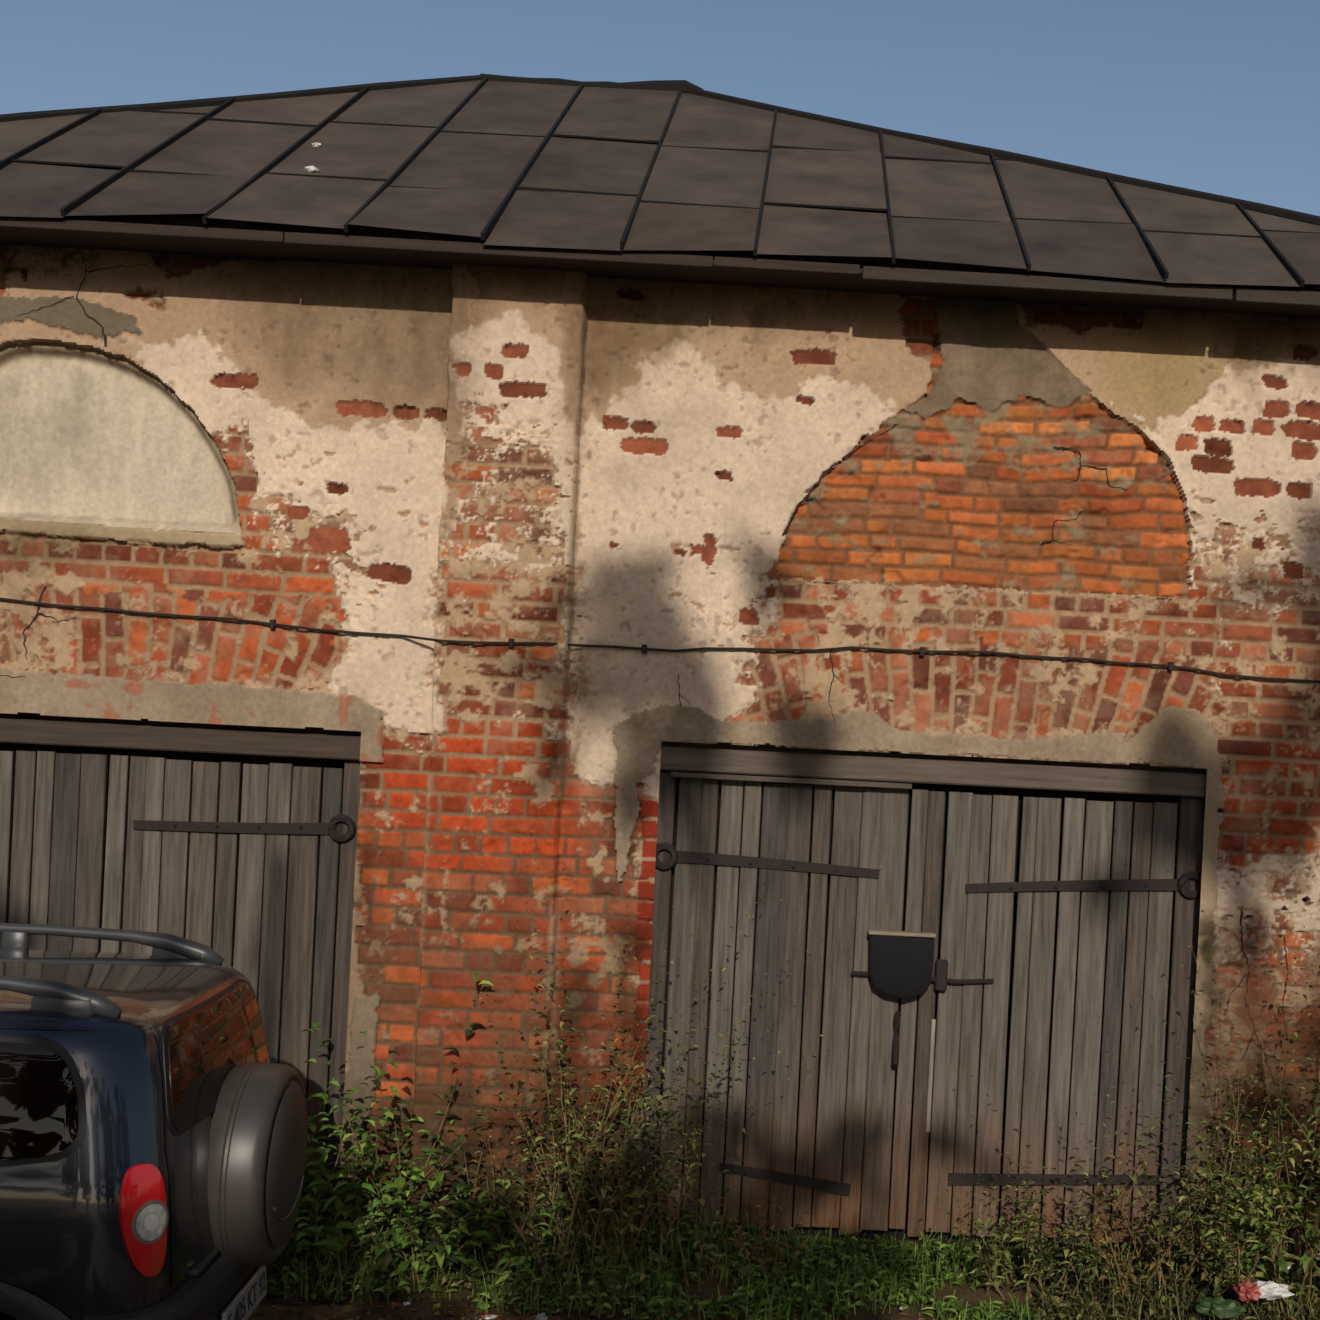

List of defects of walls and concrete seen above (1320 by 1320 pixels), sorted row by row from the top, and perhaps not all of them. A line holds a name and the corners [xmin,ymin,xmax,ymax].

crack [17,248,162,347]
spalling [211,371,259,390]
spalling [790,346,838,365]
spalling [897,296,940,361]
spalling [1017,302,1146,334]
spalling [1293,343,1318,360]
spalling [603,414,669,455]
spalling [0,417,412,691]
spalling [675,533,718,574]
crack [0,586,77,678]
spalling [337,342,657,1238]
spalling [716,373,1320,1195]